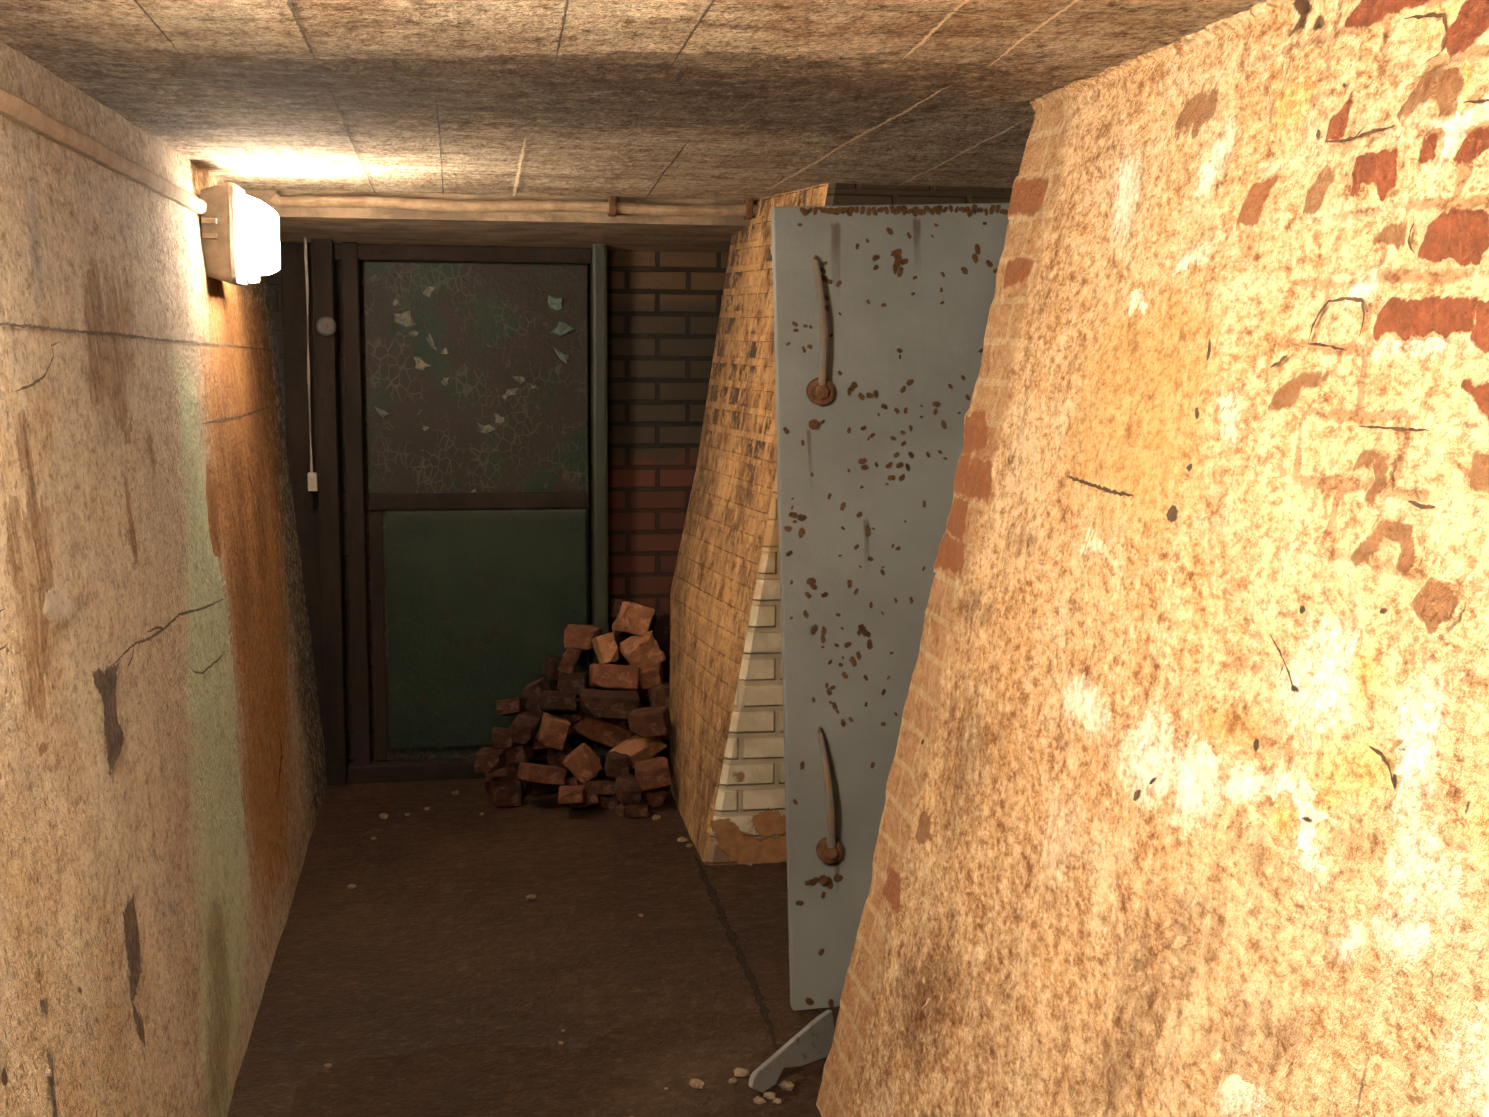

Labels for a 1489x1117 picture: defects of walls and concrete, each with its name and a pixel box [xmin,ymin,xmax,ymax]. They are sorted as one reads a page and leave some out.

spalling [1289,0,1322,37]
flaking render [1008,171,1053,222]
flaking render [1235,168,1283,232]
flaking render [1302,0,1489,500]
flaking render [1266,363,1338,416]
flaking render [933,405,997,580]
flaking render [1349,440,1466,642]
spalling [92,662,124,776]
crack [112,599,224,668]
crack [188,651,225,674]
water stain [854,107,1489,1117]
spalling [123,896,145,1046]